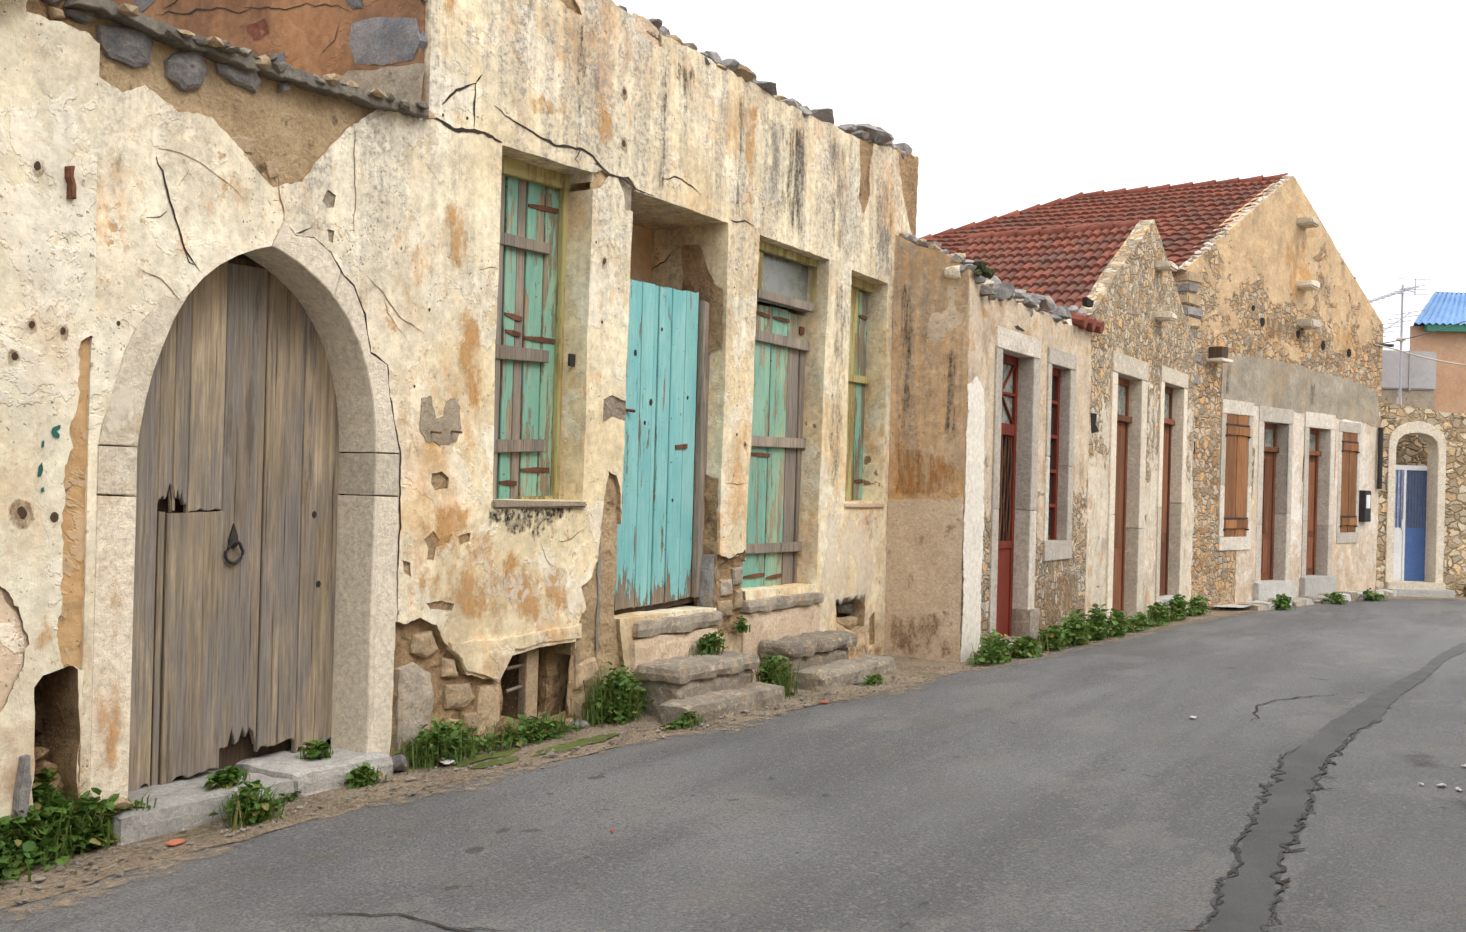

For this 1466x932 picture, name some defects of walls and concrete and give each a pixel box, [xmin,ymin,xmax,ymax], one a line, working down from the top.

crack [139,148,243,300]
spalling [26,0,374,187]
crack [350,124,358,221]
crack [434,75,701,196]
crack [278,178,424,617]
spalling [603,395,626,422]
spalling [10,326,90,669]
peeling [0,588,29,711]
spalling [32,679,64,794]
spalling [391,472,621,762]
crack [1251,695,1327,720]